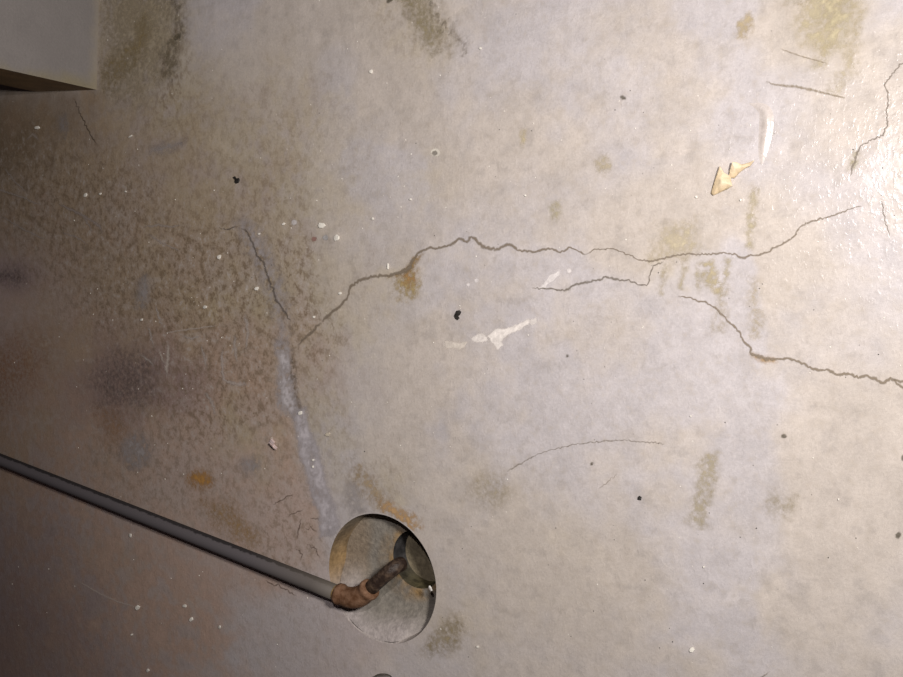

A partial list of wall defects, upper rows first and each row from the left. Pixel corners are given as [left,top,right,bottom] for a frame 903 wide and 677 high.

crack [227,227,288,318]
rust [395,256,420,299]
crack [300,206,859,344]
crack [681,296,903,388]